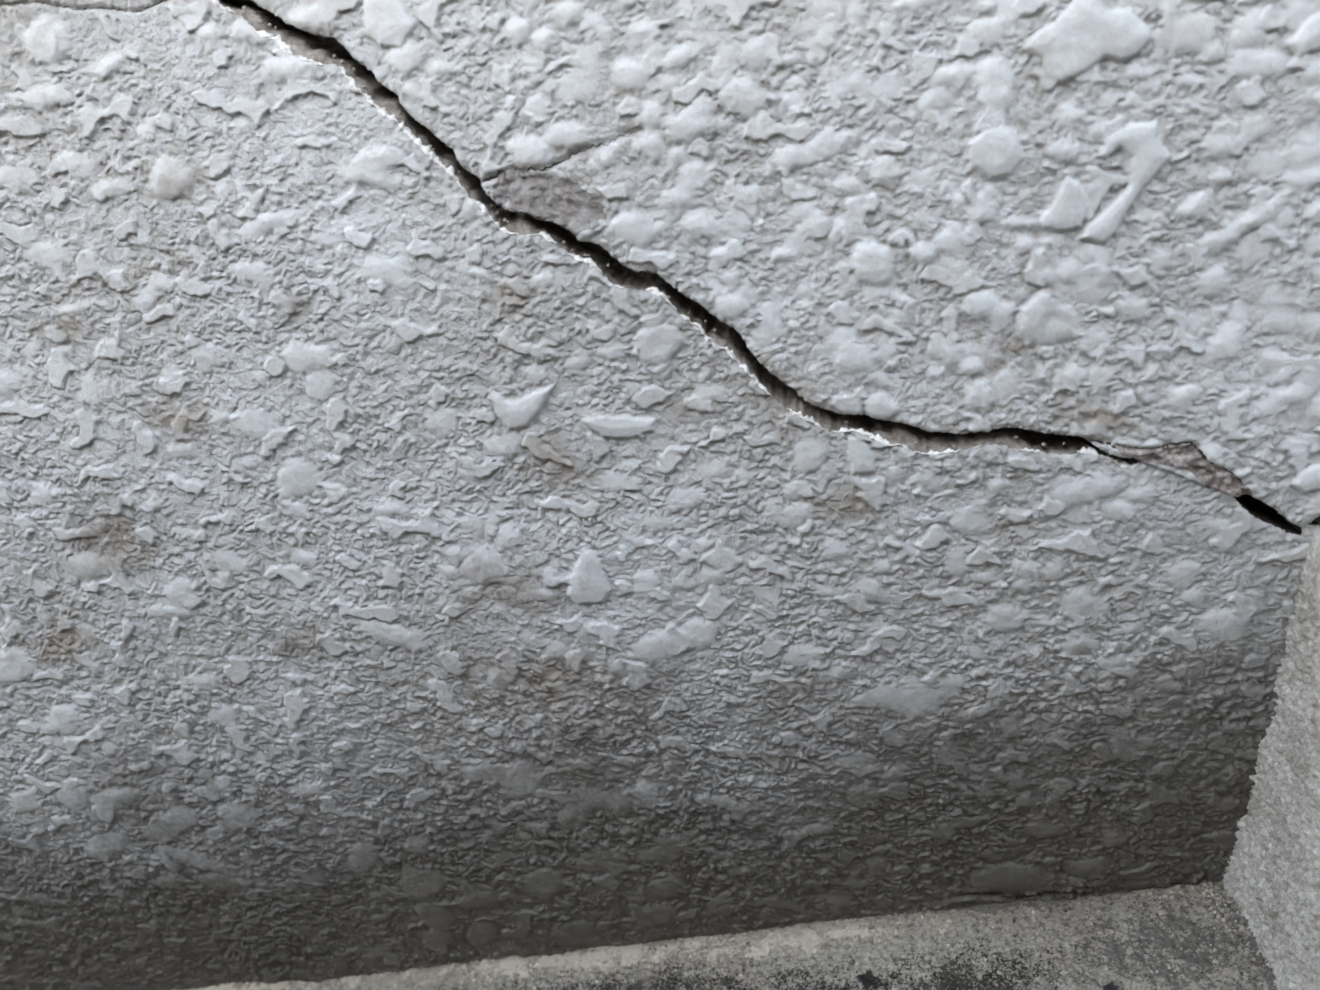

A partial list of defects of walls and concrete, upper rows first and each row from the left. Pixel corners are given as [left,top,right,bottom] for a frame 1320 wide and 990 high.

crack [2,0,166,13]
crack [212,0,1319,535]